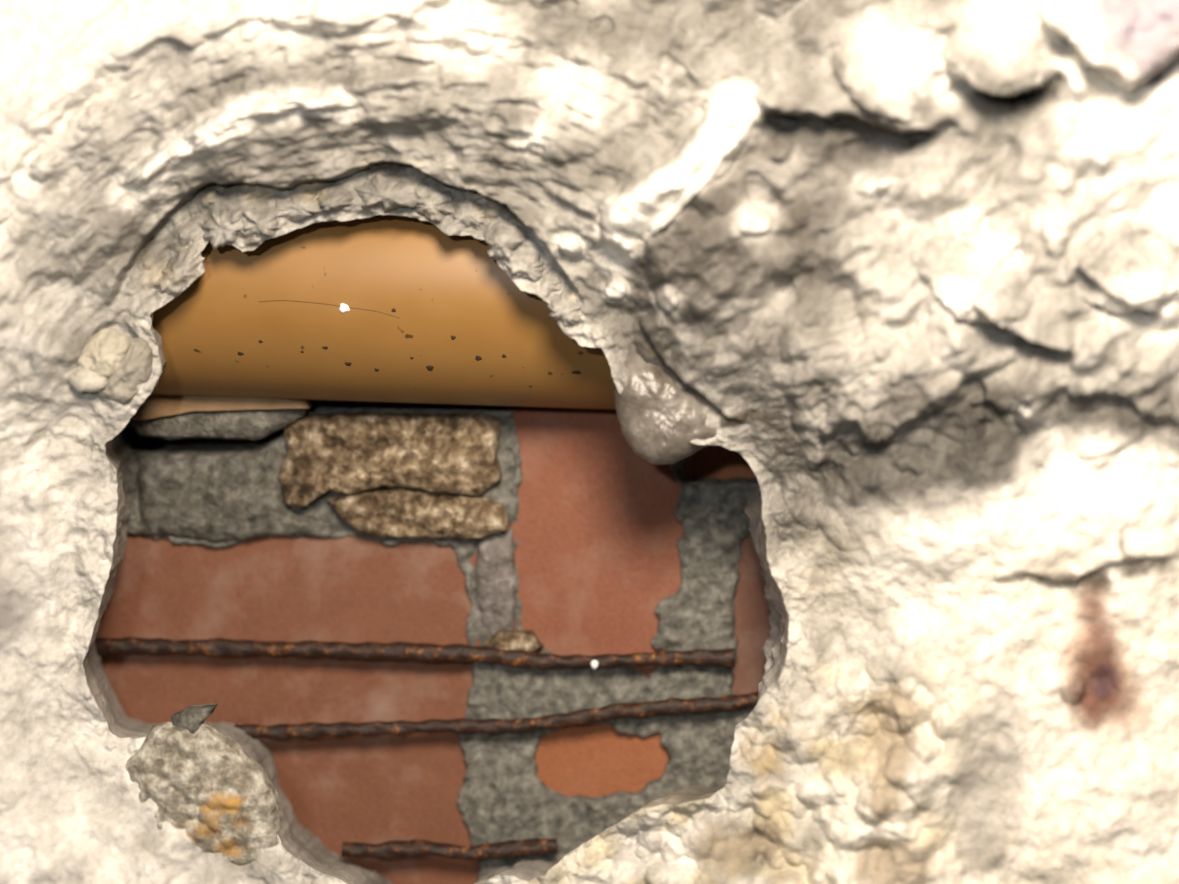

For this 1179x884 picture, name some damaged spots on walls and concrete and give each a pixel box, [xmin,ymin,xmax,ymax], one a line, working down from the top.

crack [875,115,920,136]
spalling [154,172,583,327]
crack [1027,528,1166,587]
rust [1070,601,1133,721]
spalling [866,685,914,816]
spalling [858,845,927,884]